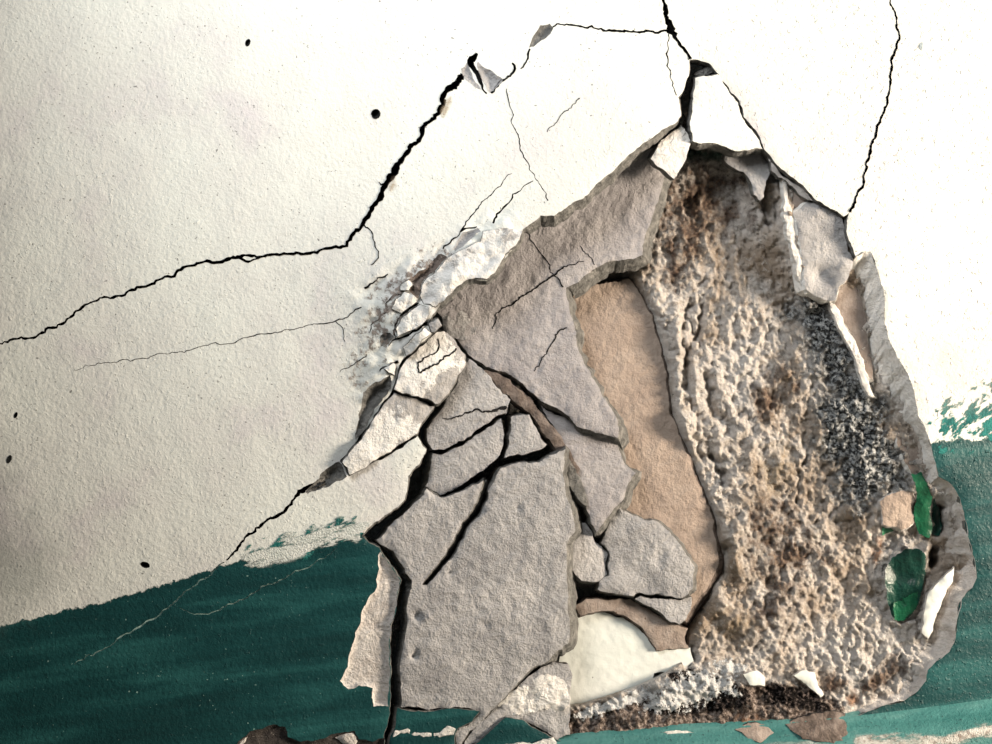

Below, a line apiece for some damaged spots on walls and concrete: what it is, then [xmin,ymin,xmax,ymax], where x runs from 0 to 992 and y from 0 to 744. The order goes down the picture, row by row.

flaking render [461,62,503,93]
crack [553,0,692,95]
spalling [676,59,710,129]
crack [848,0,901,212]
crack [0,49,548,371]
flaking render [409,228,481,298]
flaking render [380,333,395,346]
flaking render [355,375,391,439]
spalling [453,369,580,491]
spalling [557,147,992,744]
peeling [241,451,439,568]
peeling [340,550,405,707]